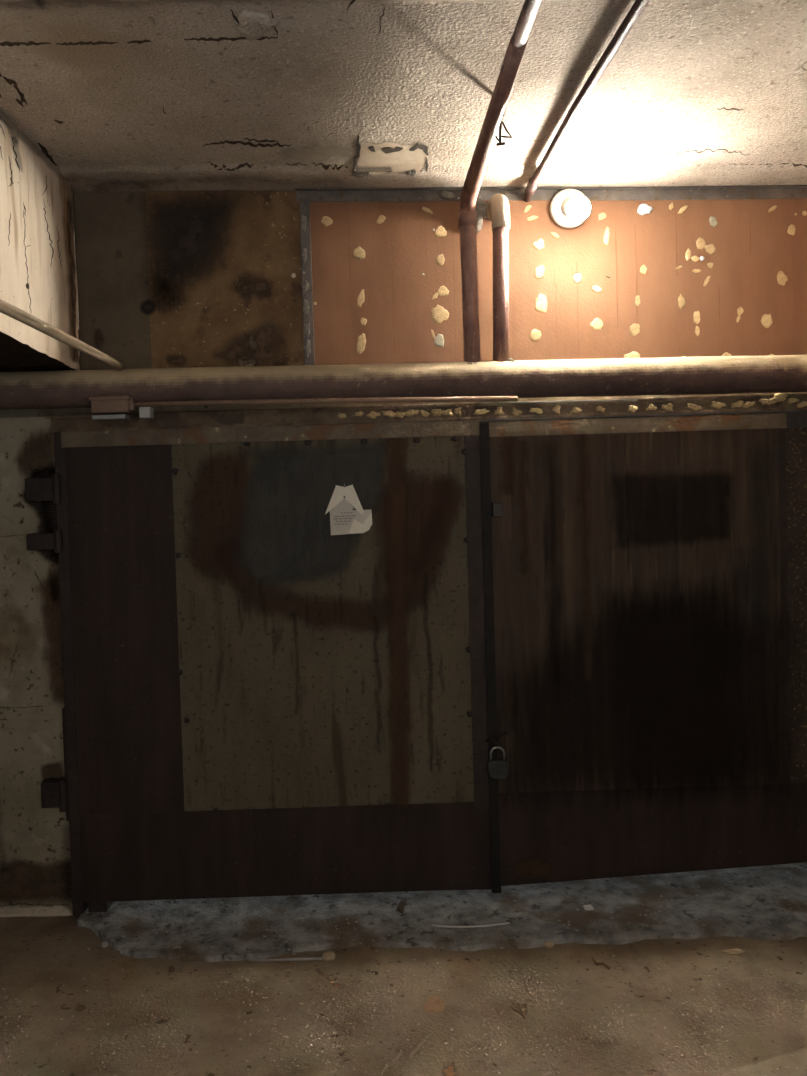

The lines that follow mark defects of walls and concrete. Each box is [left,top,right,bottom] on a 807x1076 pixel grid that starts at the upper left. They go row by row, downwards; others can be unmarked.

crack [0,38,152,46]
crack [184,9,278,42]
crack [0,73,27,107]
crack [202,138,348,171]
spalling [352,136,429,178]
crack [0,142,62,308]